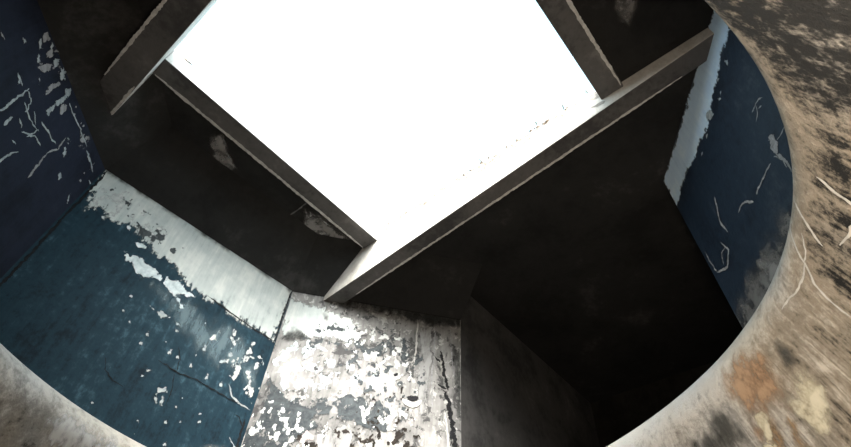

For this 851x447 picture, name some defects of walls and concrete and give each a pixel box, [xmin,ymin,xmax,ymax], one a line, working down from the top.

peeling [37,32,77,116]
spalling [357,76,682,294]
peeling [664,11,730,205]
peeling [84,170,433,447]
crack [414,319,459,447]